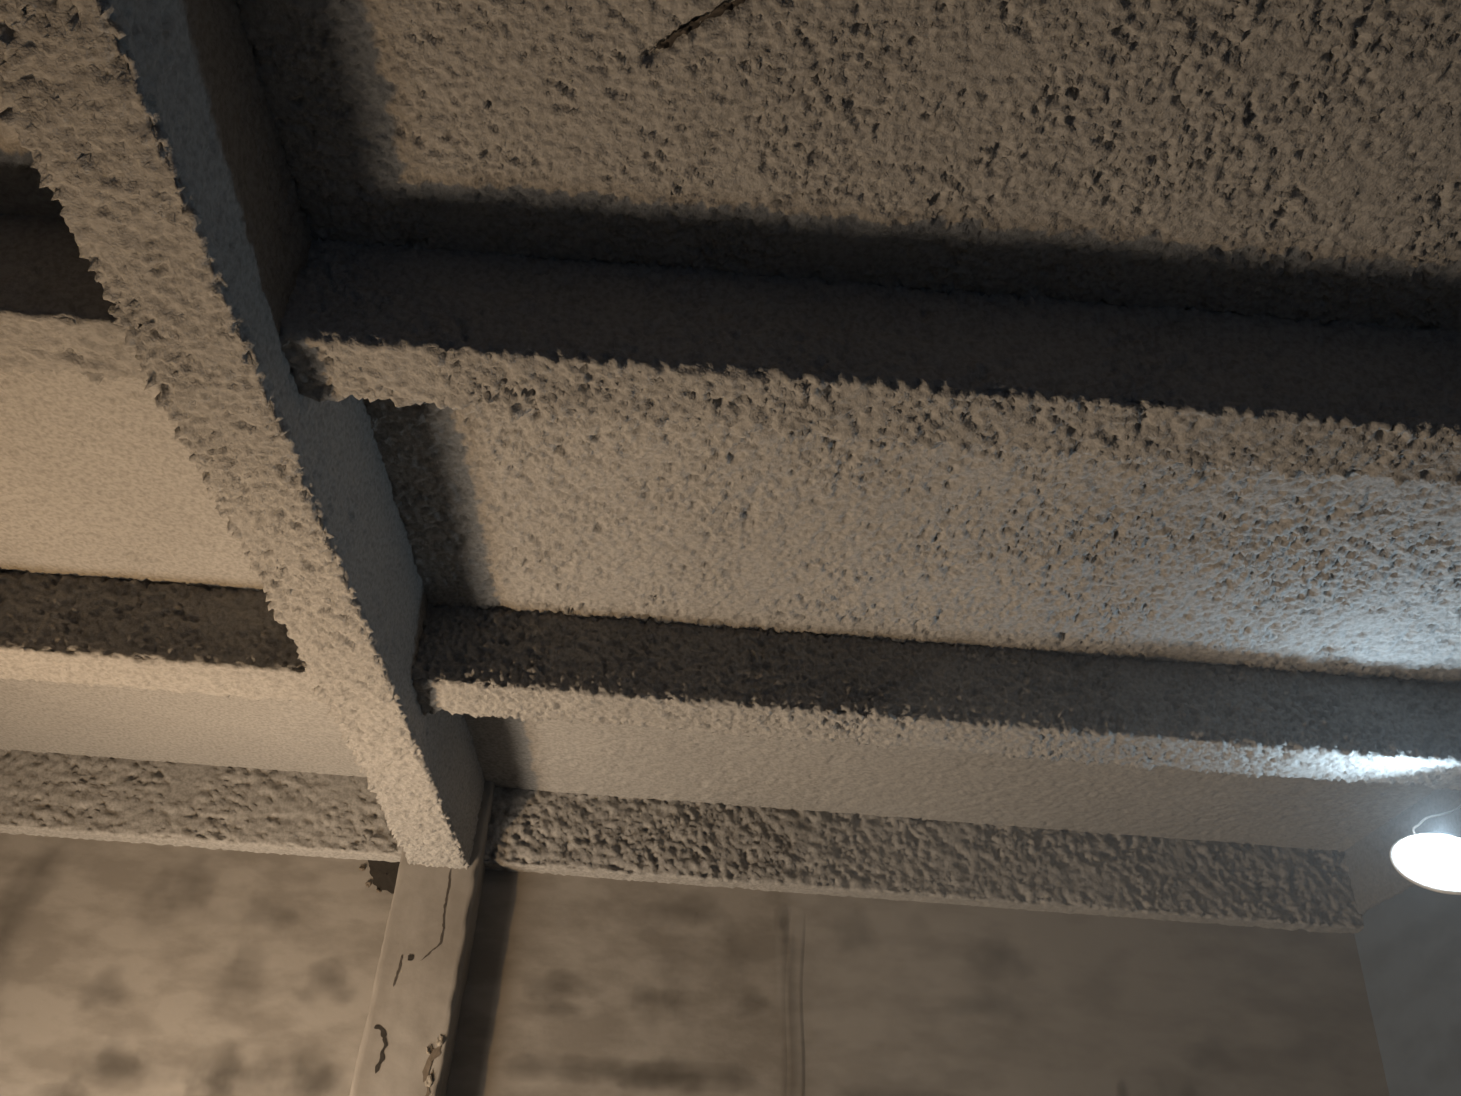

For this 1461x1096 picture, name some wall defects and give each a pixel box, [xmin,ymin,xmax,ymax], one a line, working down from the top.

crack [646,0,745,56]